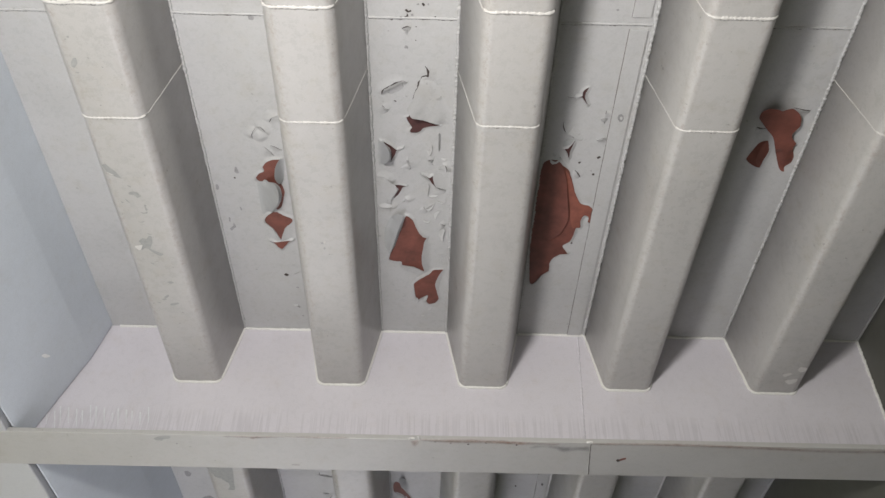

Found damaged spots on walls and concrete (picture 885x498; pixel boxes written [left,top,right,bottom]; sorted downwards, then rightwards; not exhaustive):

peeling [743,101,813,172]
peeling [252,155,296,251]
peeling [377,65,452,317]
peeling [526,138,593,285]
peeling [391,478,413,498]